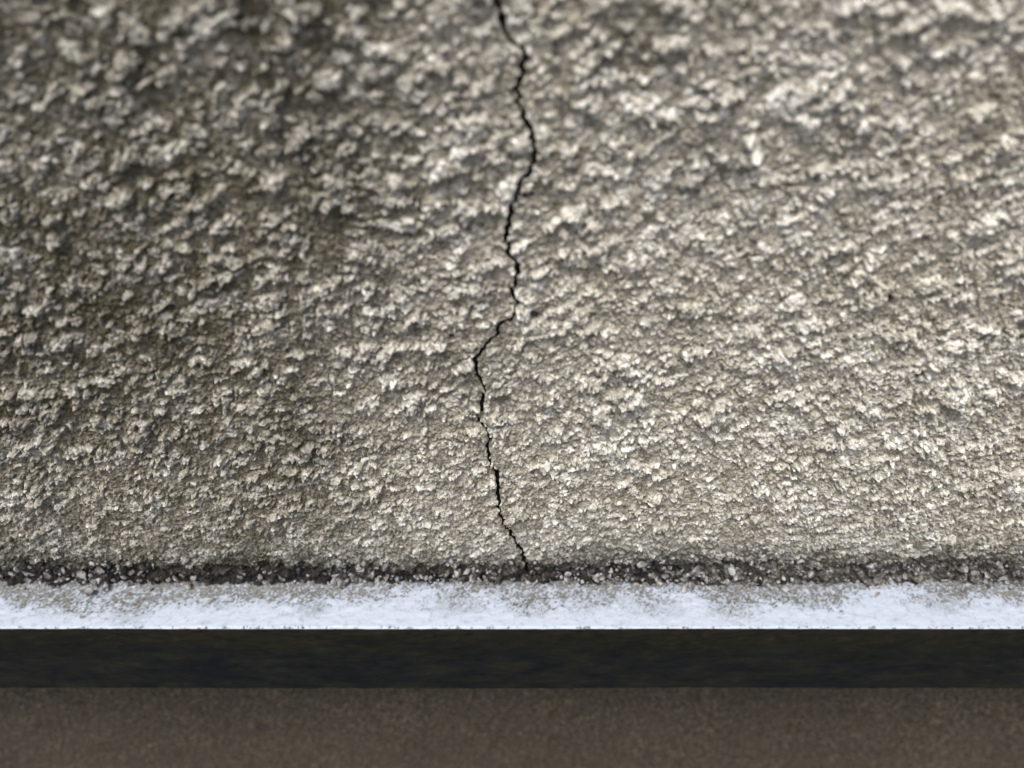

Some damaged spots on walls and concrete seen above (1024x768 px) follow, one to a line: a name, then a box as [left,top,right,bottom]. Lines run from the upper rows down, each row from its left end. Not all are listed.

crack [472,0,538,572]